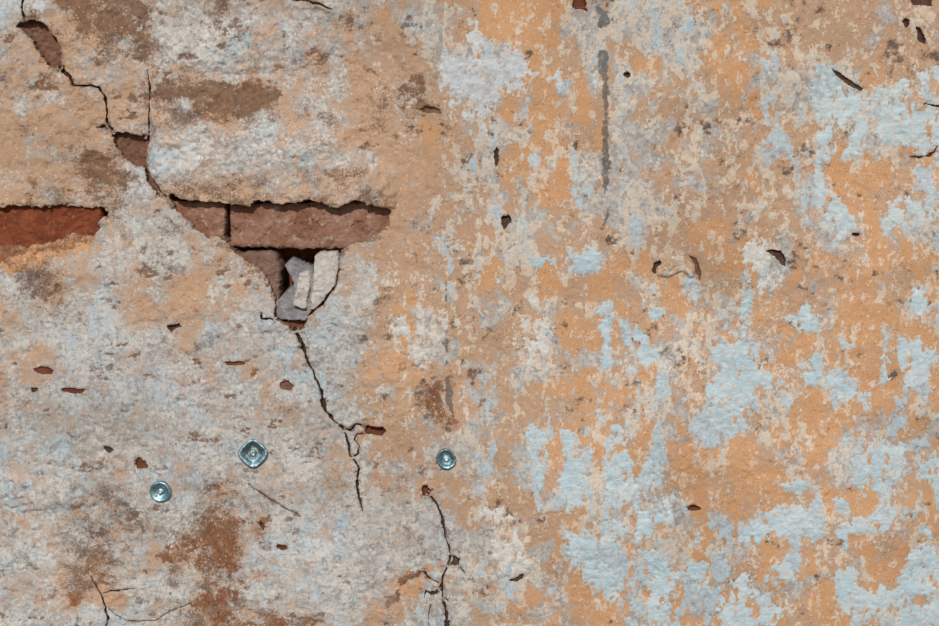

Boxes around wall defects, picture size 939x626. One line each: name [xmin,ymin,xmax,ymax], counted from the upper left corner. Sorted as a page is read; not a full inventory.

crack [18,0,28,22]
spalling [0,0,64,73]
crack [56,62,117,134]
crack [145,70,153,140]
peeling [807,65,939,243]
spalling [0,202,111,250]
spalling [109,129,393,334]
peeling [705,238,939,439]
crack [258,313,366,511]
crack [418,490,468,626]
peeling [564,424,801,626]
peeling [737,436,939,546]